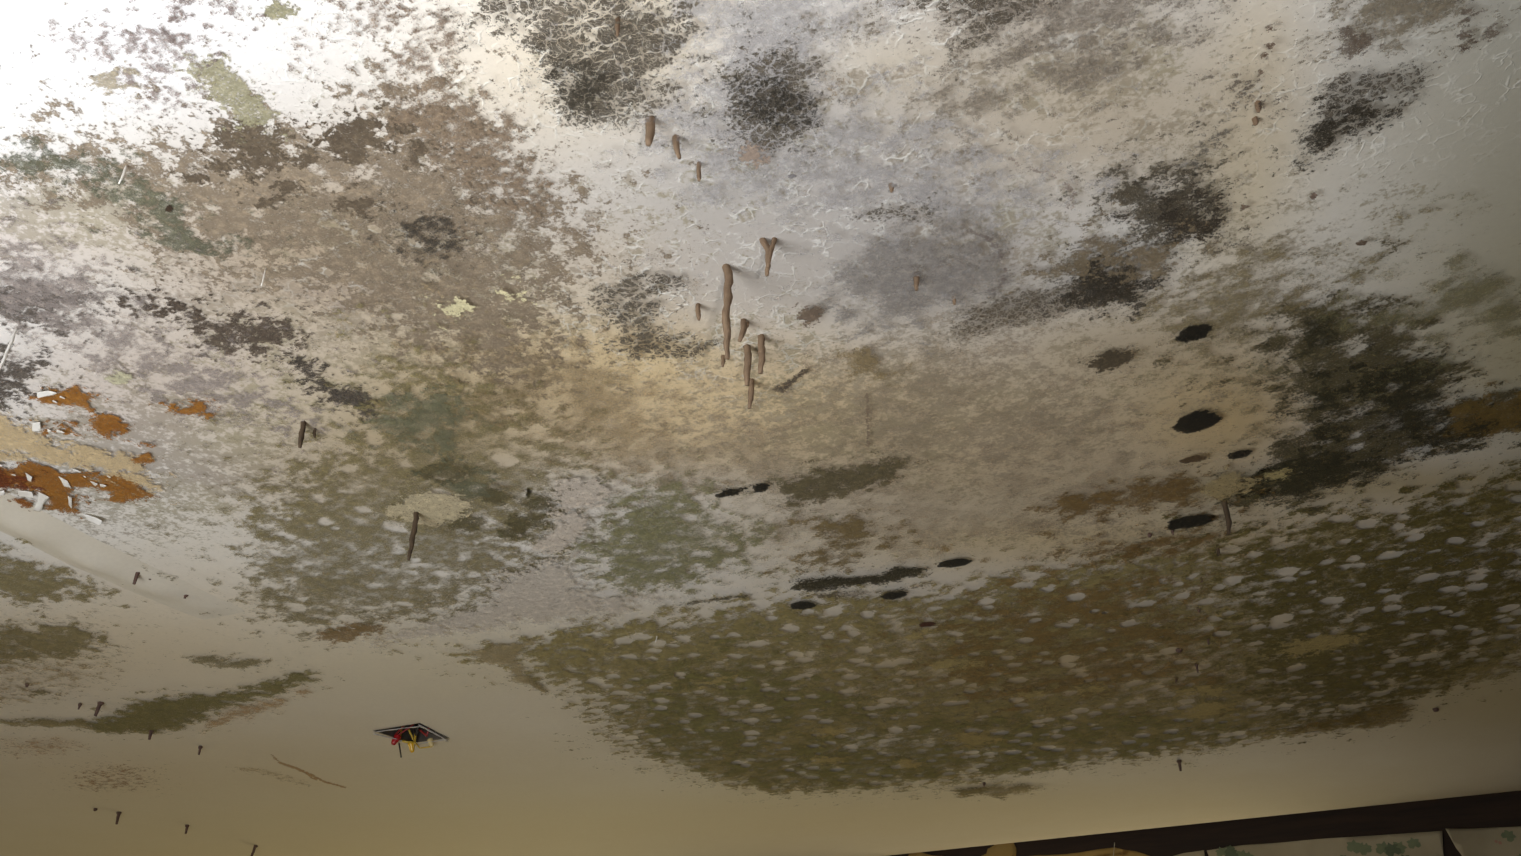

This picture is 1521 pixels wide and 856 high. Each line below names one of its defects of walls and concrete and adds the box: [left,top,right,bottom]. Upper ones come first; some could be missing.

peeling [0,411,180,505]
water stain [0,538,345,766]